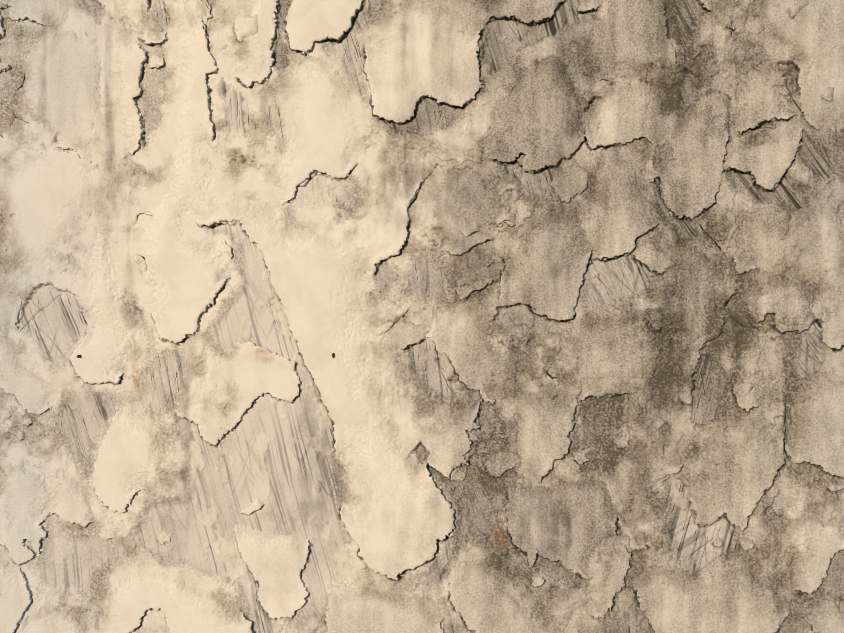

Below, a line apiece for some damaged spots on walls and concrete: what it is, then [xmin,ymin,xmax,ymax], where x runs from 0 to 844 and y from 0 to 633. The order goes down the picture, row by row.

spalling [0,402,45,460]
spalling [0,457,137,633]
flaking render [18,227,190,513]
spalling [95,0,444,633]
flaking render [233,0,844,633]